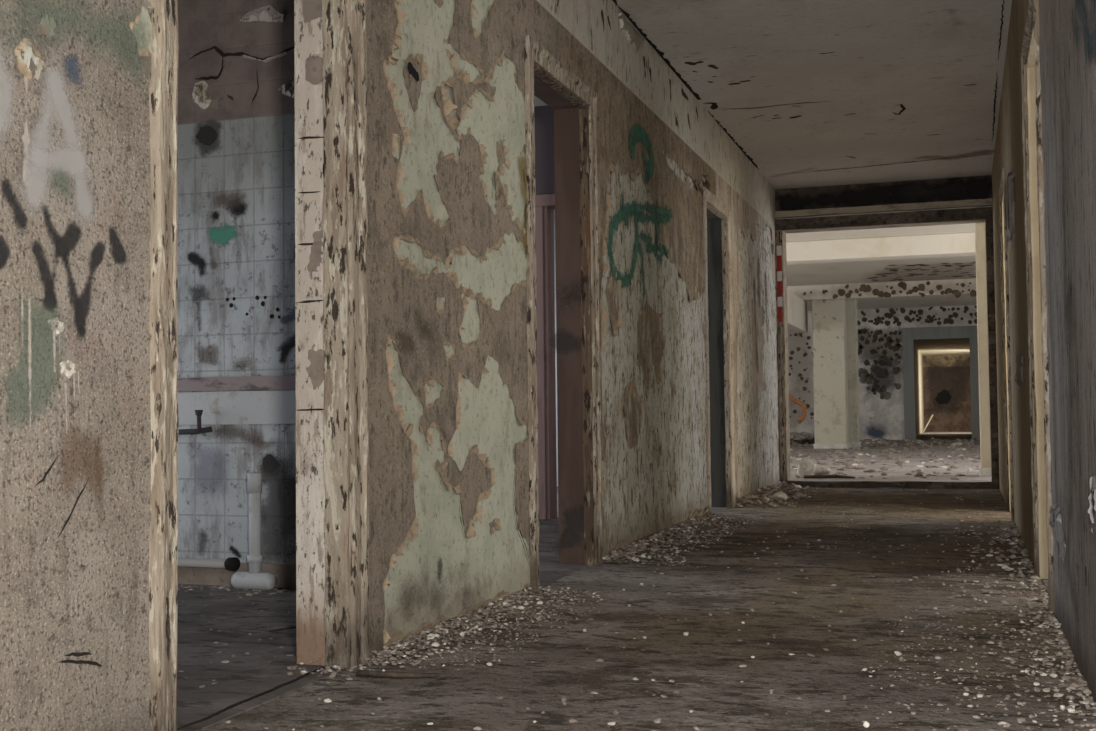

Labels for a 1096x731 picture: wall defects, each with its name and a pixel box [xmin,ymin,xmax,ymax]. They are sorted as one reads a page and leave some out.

crack [190,46,294,105]
peeling [383,0,535,647]
leakage [803,262,977,400]
peeling [1050,501,1066,566]
peeling [1088,473,1096,542]